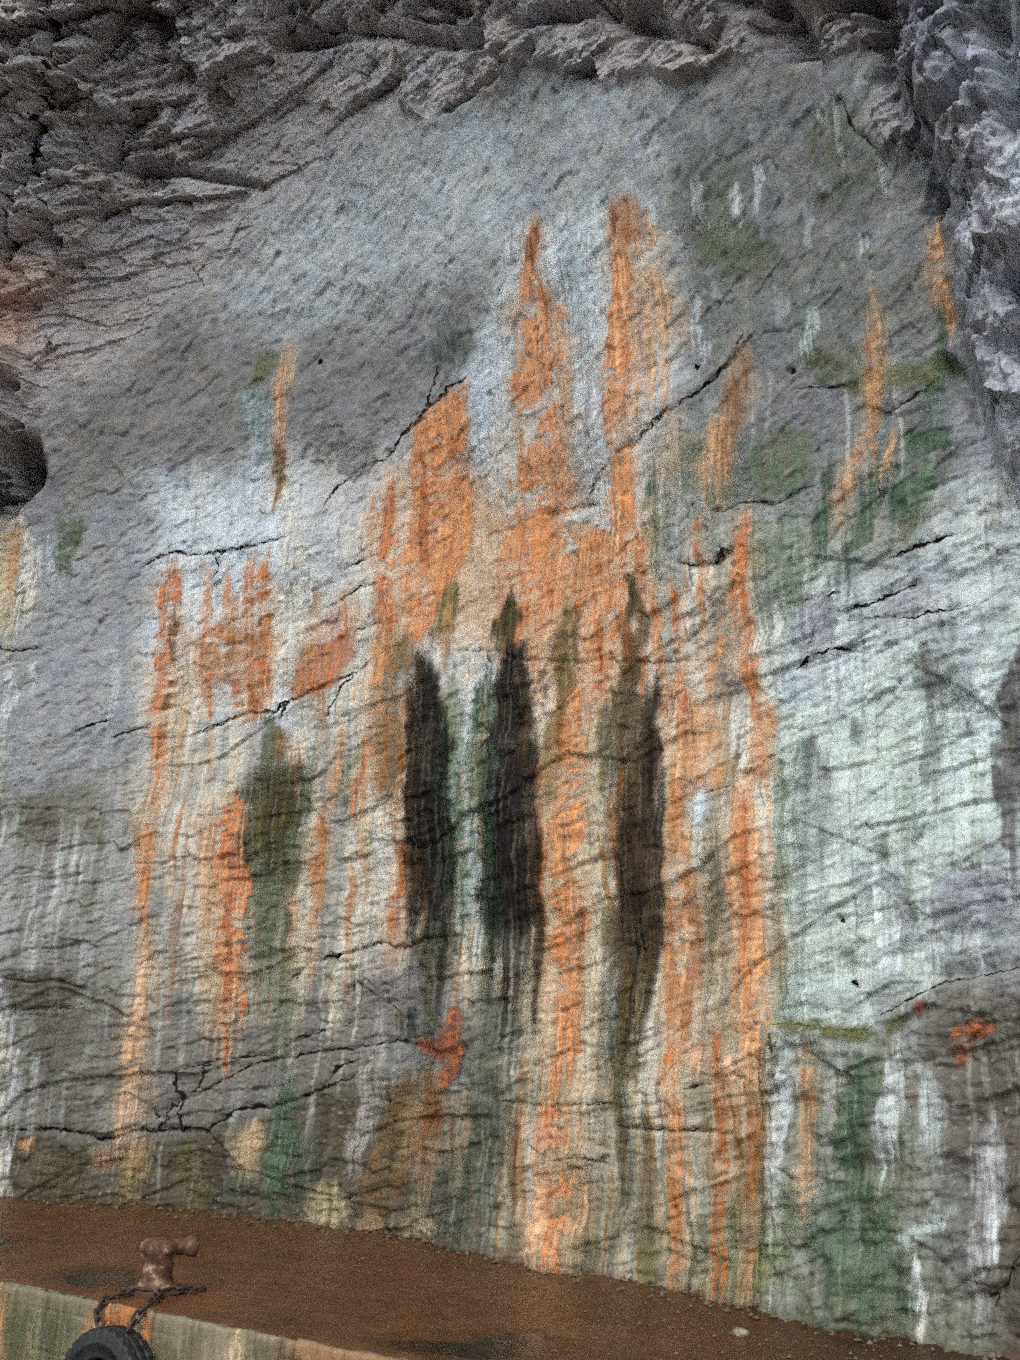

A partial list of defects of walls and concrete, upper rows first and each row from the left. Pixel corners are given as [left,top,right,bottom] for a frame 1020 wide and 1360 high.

rust [148,550,273,805]
crack [141,536,286,578]
crack [75,554,379,737]
water stain [167,463,341,1057]
rust [271,351,295,509]
water stain [394,223,580,1252]
rust [286,197,776,1297]
crack [793,534,974,669]
water stain [991,643,1020,884]
crack [0,938,440,1141]
rust [196,787,252,1079]
water stain [579,574,675,1234]